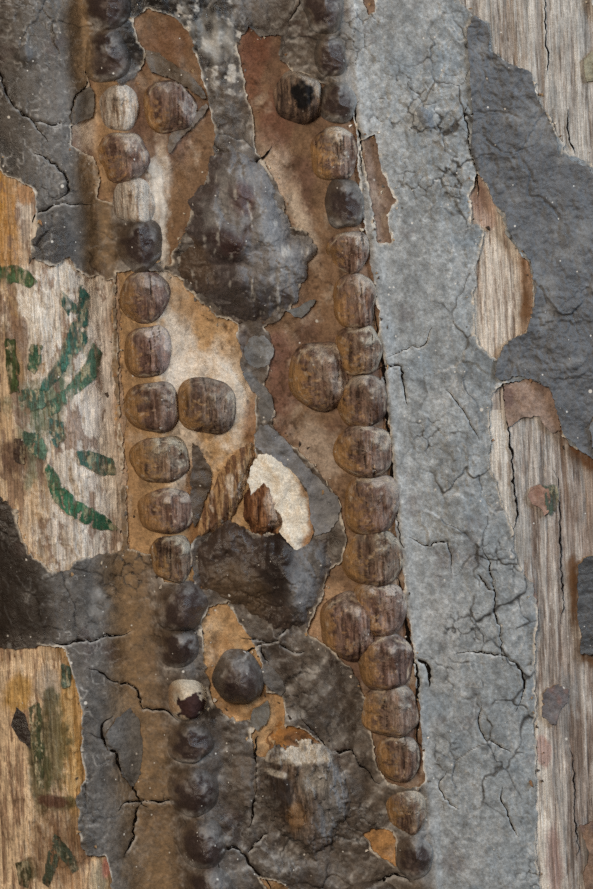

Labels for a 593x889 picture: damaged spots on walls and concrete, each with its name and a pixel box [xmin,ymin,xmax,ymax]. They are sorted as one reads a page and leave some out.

crack [0,60,92,222]
peeling [0,8,396,572]
crack [374,311,431,478]
crack [502,380,519,529]
peeling [460,0,593,889]
peeling [0,645,112,889]
crack [100,716,170,855]
peeling [201,602,321,757]
peeling [307,563,359,643]
peeling [371,616,425,788]
crack [404,617,431,748]
crack [456,550,525,711]